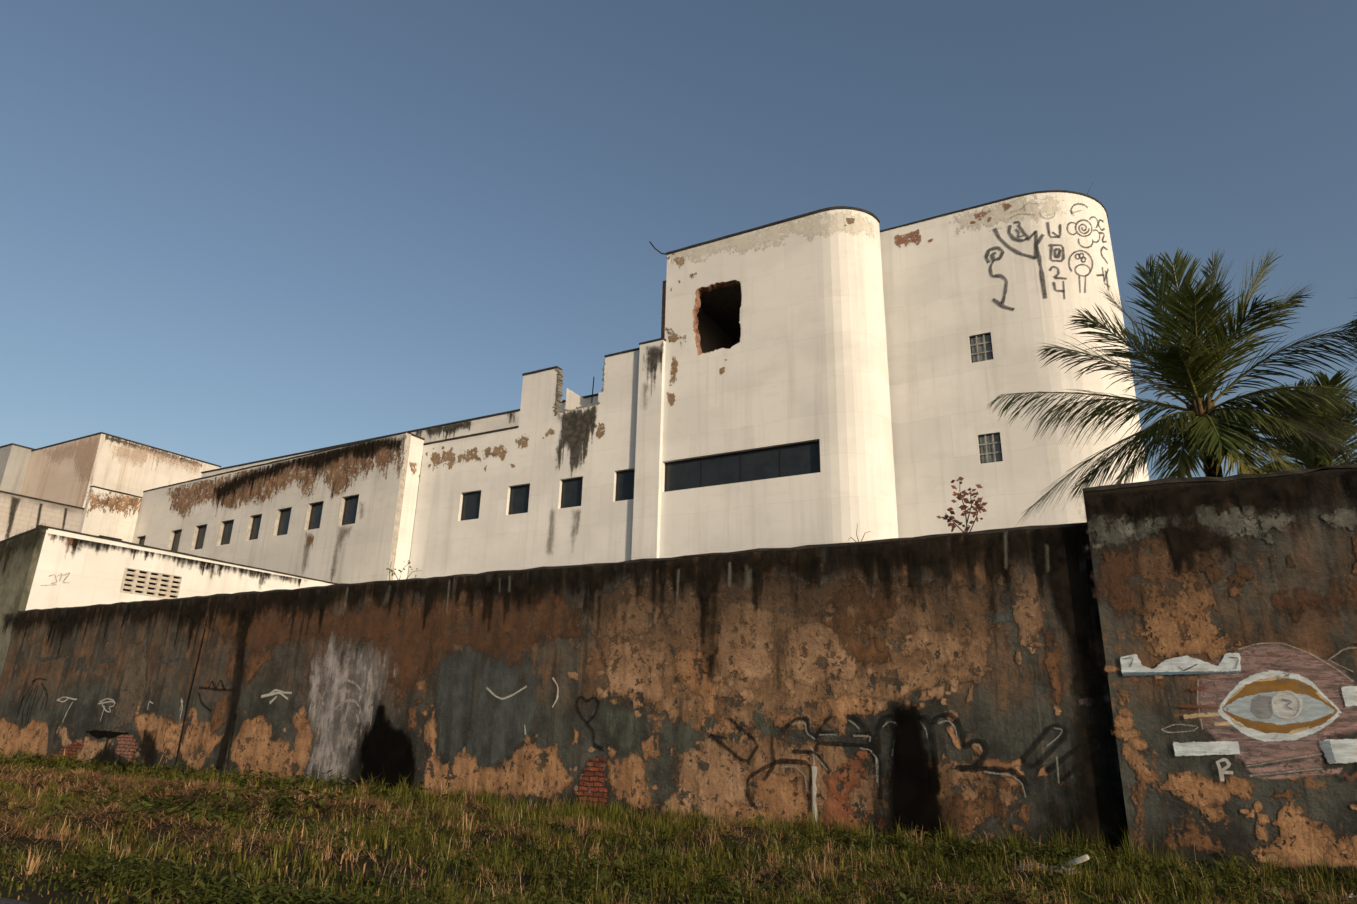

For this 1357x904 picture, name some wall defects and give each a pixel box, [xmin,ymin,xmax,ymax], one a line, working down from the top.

spalling [894,229,933,248]
peeling [82,489,142,519]
peeling [166,359,606,520]
leakage [556,406,597,475]
leakage [645,343,664,394]
peeling [0,618,316,784]
leakage [2,474,1319,859]
peeling [391,565,1064,843]
peeling [1111,689,1357,872]